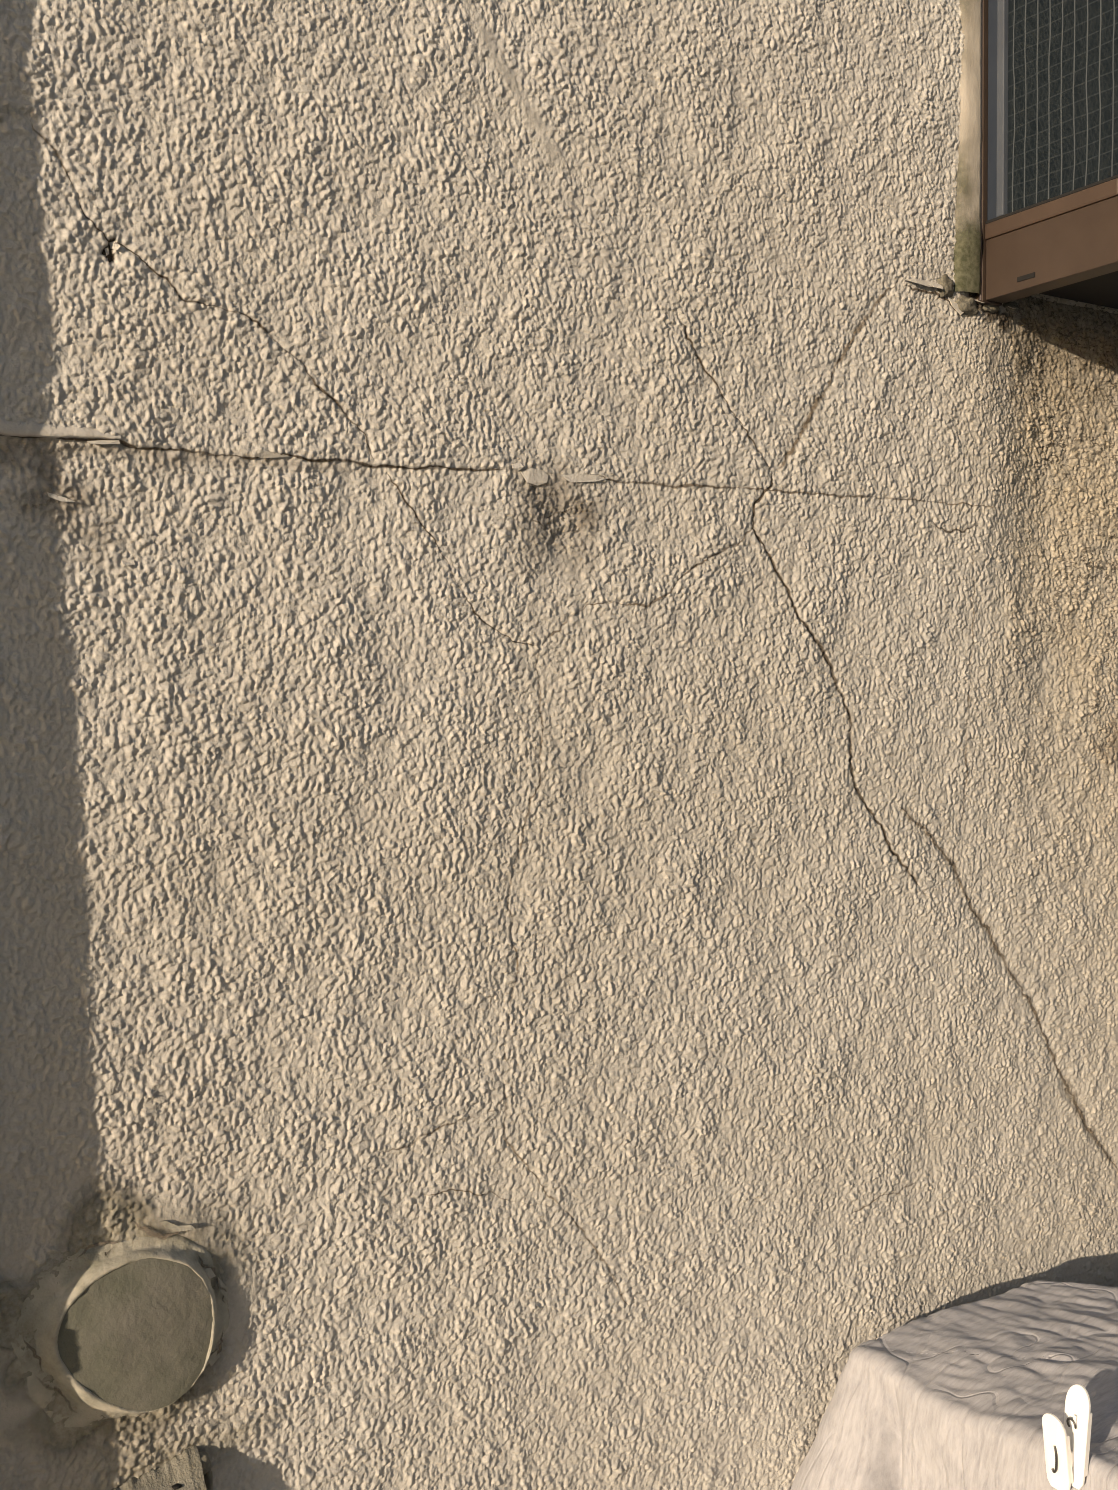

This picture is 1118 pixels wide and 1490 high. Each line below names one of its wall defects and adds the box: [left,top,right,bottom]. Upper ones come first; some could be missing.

crack [32,125,267,332]
crack [0,281,1117,1168]
crack [431,1188,497,1196]
crack [503,1105,626,1303]